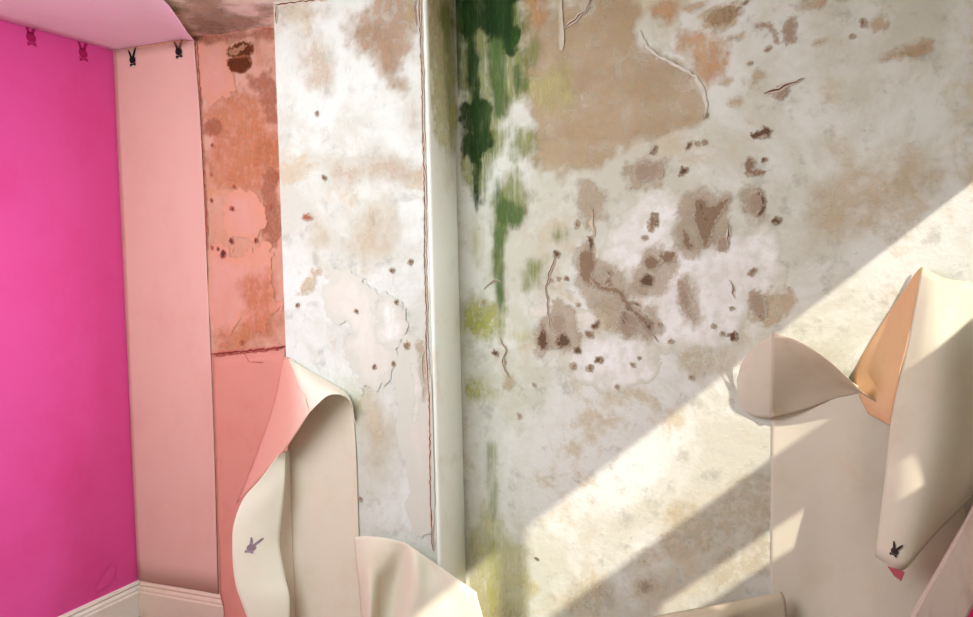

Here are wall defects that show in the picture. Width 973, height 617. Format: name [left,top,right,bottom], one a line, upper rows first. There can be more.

water stain [173,0,273,44]
peeling [195,33,253,106]
water stain [251,73,277,123]
water stain [357,0,417,71]
crack [563,0,592,29]
crack [640,30,708,119]
water stain [429,0,555,336]
water stain [262,171,281,243]
water stain [577,244,698,340]